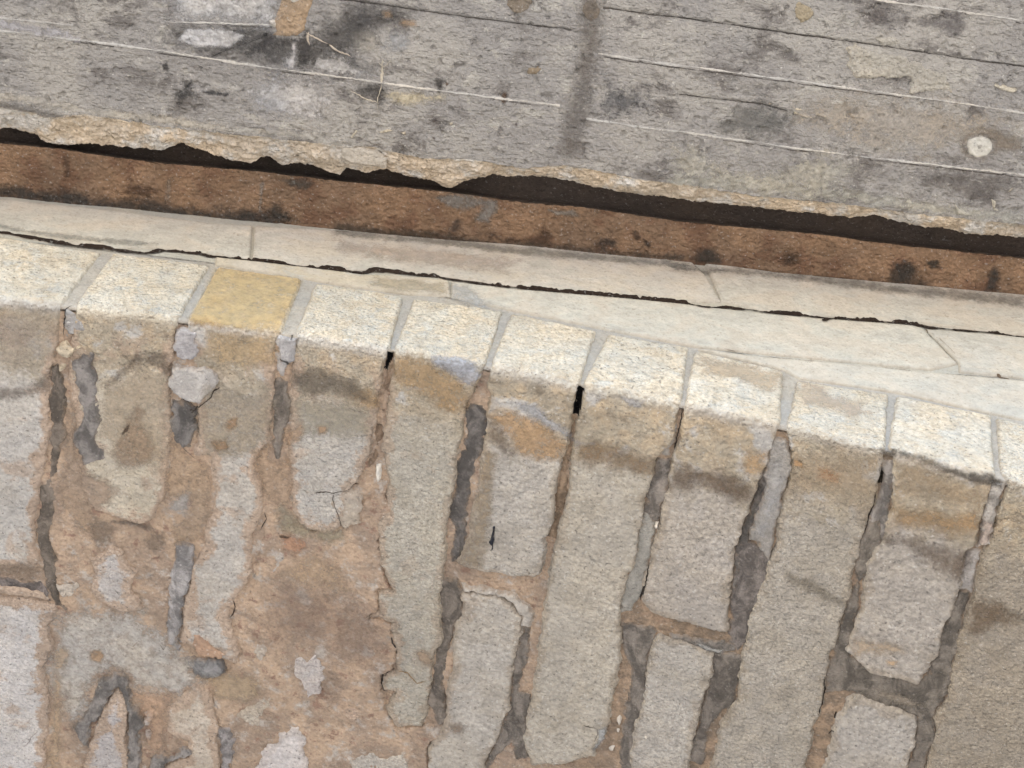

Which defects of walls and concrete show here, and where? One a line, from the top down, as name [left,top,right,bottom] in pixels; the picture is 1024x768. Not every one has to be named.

spalling [0,108,1024,238]
crack [0,231,1024,381]